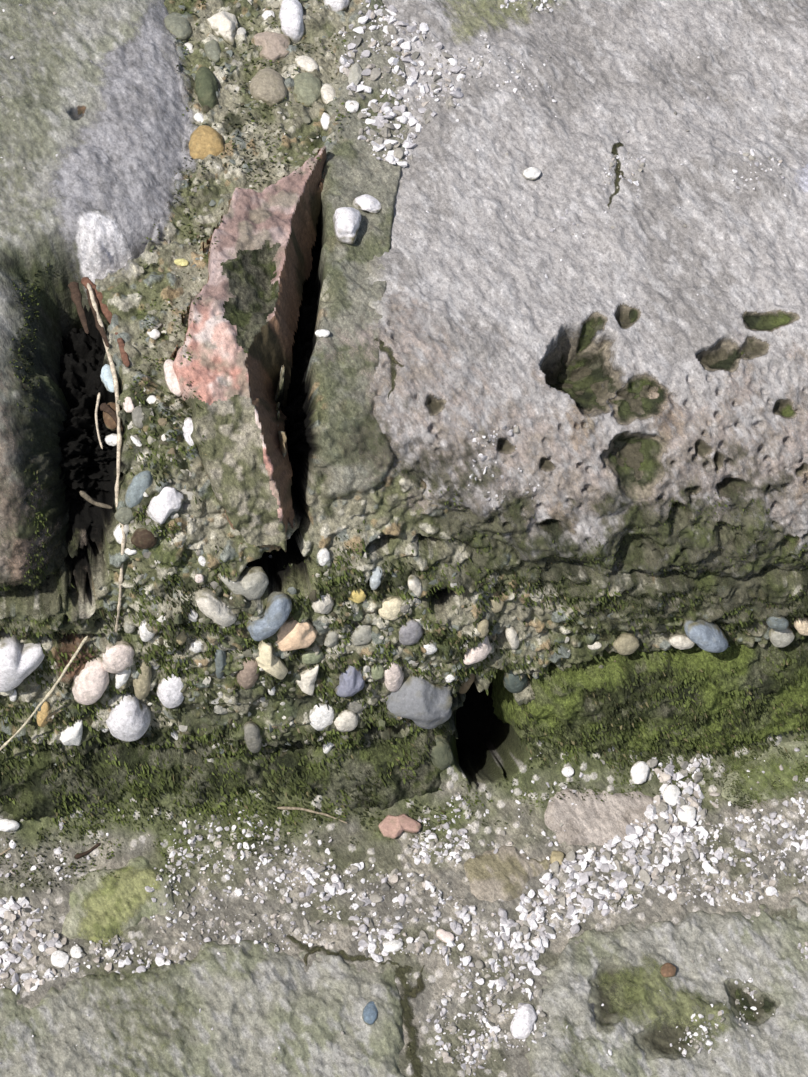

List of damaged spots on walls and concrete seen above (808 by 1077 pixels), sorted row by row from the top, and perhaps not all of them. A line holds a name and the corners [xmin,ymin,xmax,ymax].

spalling [315,329,330,338]
hole [696,310,799,372]
hole [539,304,669,500]
hole [773,399,797,419]
hole [695,440,745,498]
spalling [795,463,808,477]
spalling [146,487,184,525]
hole [674,486,702,518]
hole [783,534,801,547]
spalling [445,674,475,694]
crack [286,934,425,1077]